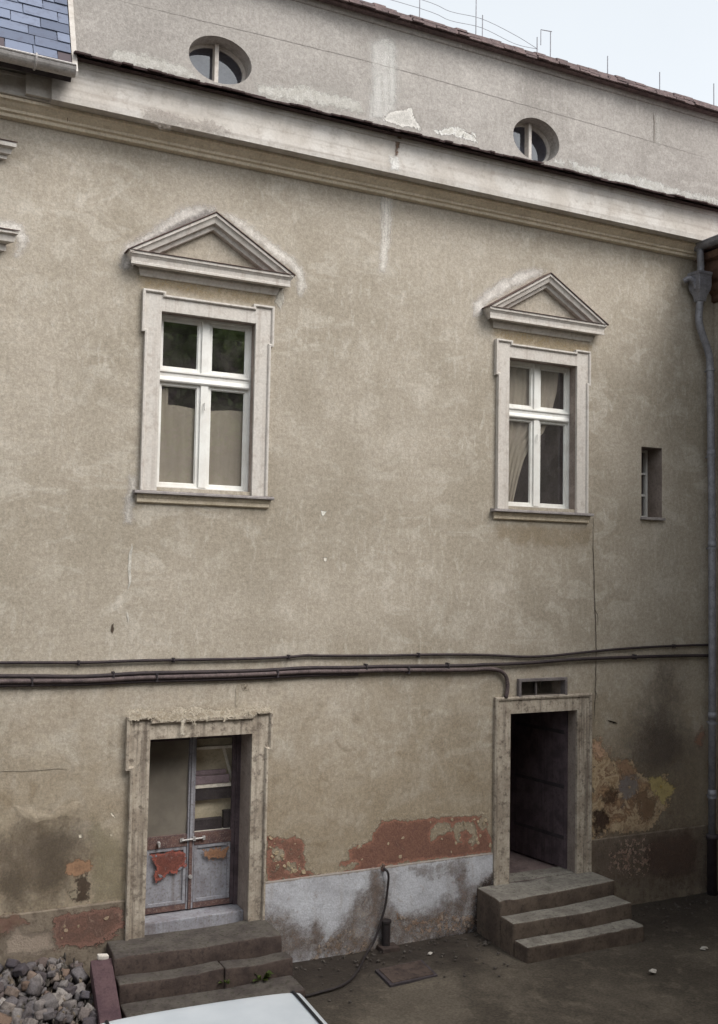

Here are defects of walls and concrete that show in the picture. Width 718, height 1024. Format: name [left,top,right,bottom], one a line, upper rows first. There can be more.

peeling [434,126,478,144]
damp [380,196,392,272]
peeling [266,834,321,881]
peeling [339,813,493,872]
peeling [592,737,674,879]
peeling [52,858,125,952]
damp [267,870,493,958]